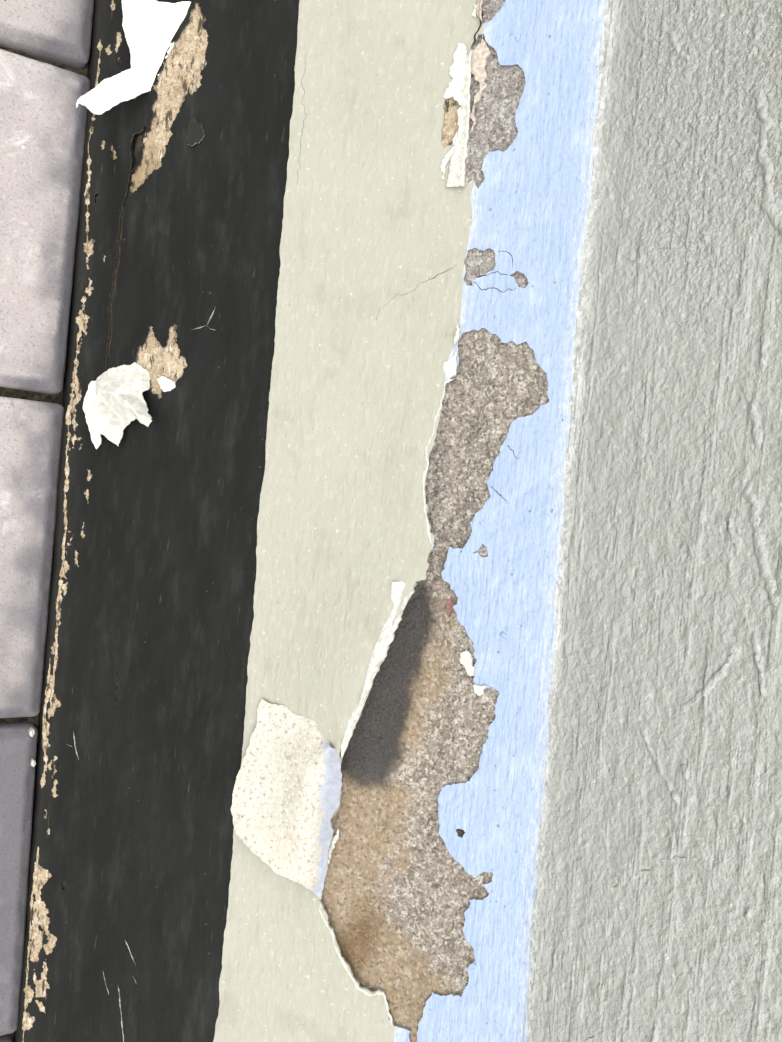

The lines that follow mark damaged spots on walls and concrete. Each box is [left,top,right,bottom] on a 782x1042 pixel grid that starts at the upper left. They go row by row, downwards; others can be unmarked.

peeling [440,0,525,189]
peeling [464,249,529,292]
peeling [40,0,208,798]
flaking render [230,324,549,1042]
peeling [22,847,57,1042]